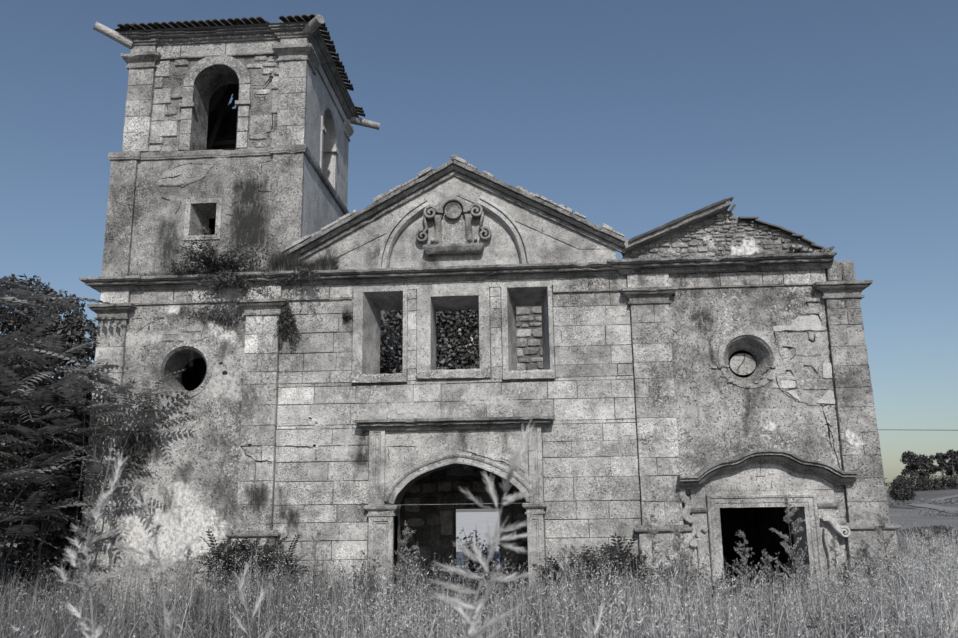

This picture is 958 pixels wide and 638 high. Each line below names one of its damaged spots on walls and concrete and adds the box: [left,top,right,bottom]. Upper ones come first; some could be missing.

water stain [232,180,266,250]
flaking render [772,294,835,406]
water stain [121,428,161,465]
crack [819,404,842,470]